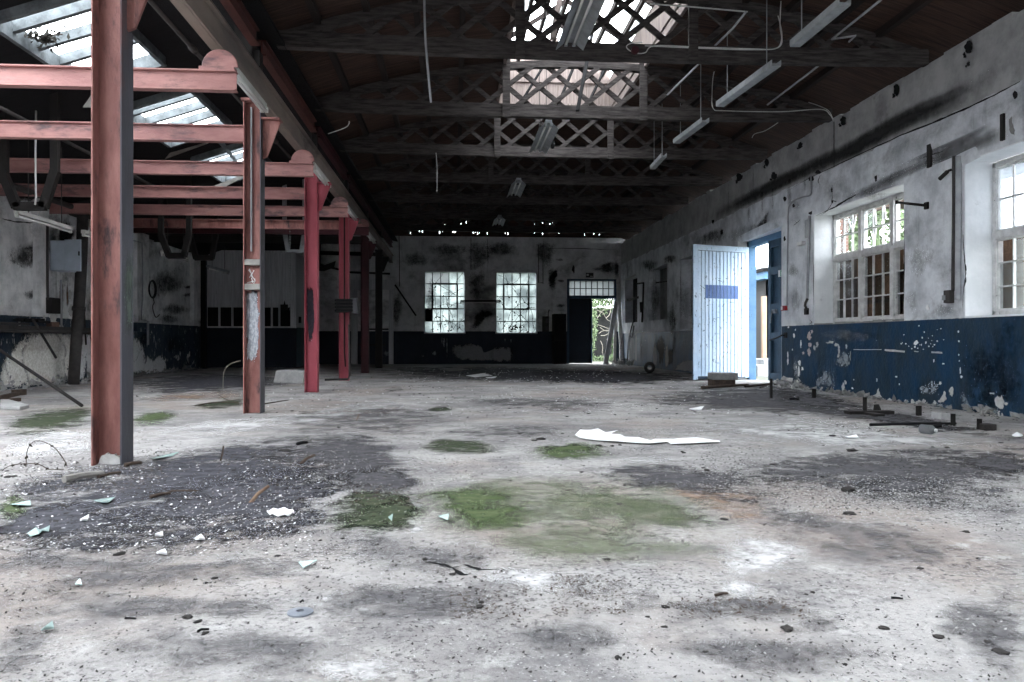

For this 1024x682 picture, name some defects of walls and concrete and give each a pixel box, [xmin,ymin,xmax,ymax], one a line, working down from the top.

leakage [406,243,512,267]
leakage [426,284,435,313]
peeling [0,290,91,387]
peeling [787,326,847,376]
spalling [873,330,963,405]
spalling [990,392,1008,416]